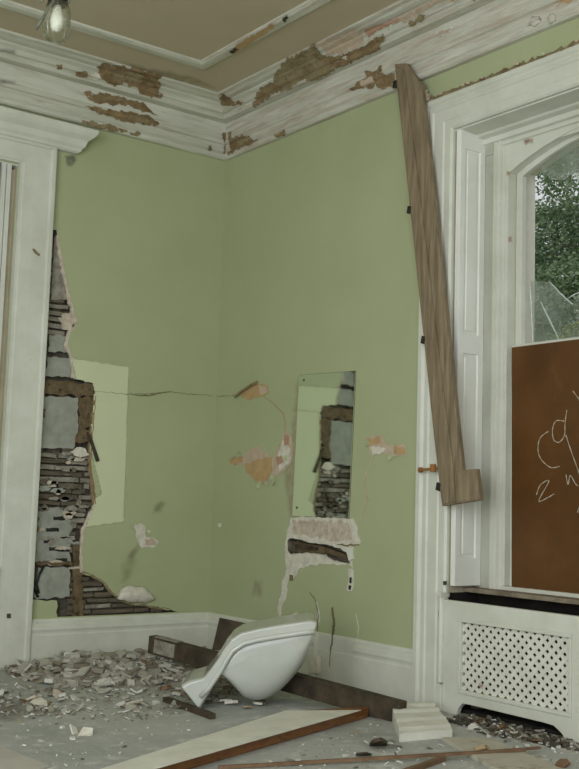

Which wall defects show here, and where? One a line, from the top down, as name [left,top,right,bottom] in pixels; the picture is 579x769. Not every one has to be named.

peeling [75,62,165,137]
peeling [222,131,258,155]
peeling [219,0,458,108]
spalling [33,235,171,616]
crack [95,389,233,397]
peeling [229,381,293,489]
peeling [359,434,407,525]